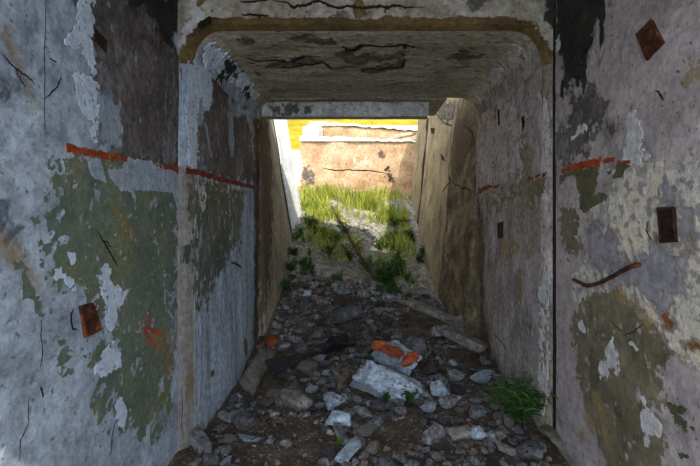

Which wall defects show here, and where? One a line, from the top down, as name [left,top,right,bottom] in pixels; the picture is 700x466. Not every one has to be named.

crack [240,0,425,17]
damp [597,0,605,48]
crack [2,0,62,121]
crack [240,44,419,87]
crack [98,231,119,268]
peeling [30,42,262,446]
peeling [558,109,700,466]